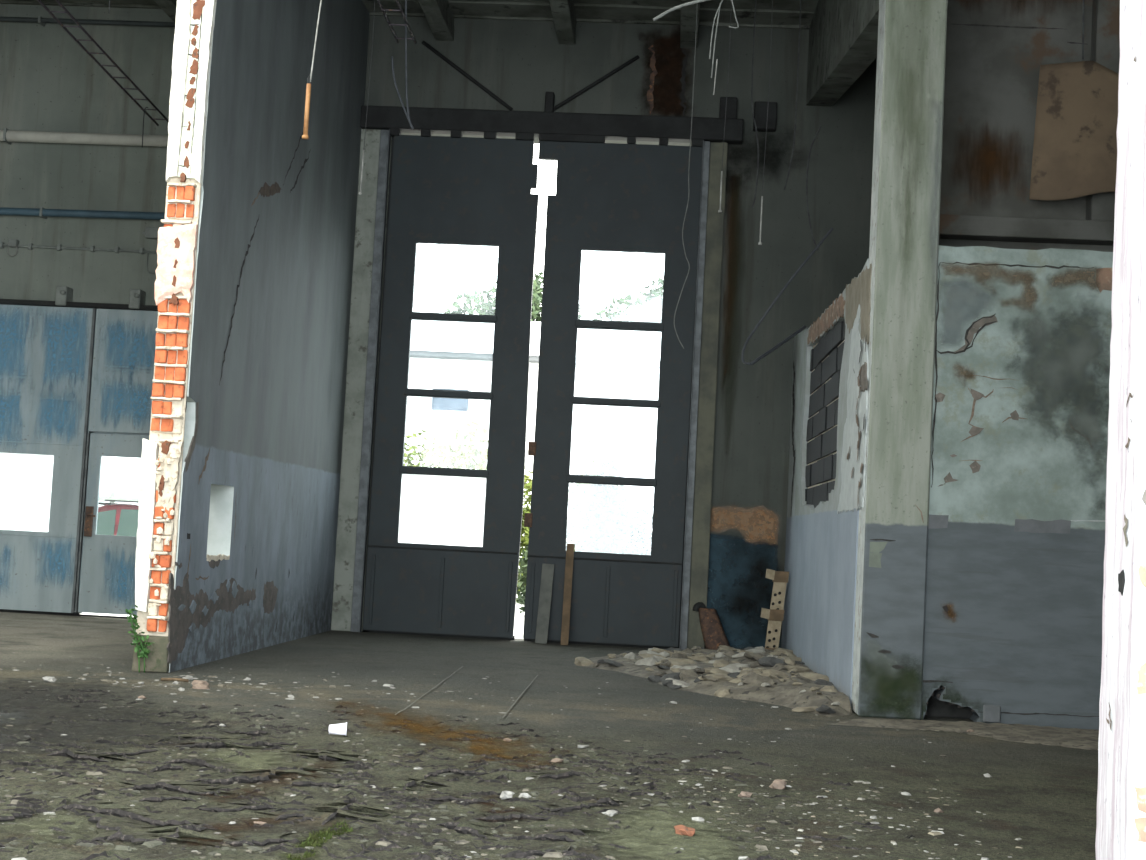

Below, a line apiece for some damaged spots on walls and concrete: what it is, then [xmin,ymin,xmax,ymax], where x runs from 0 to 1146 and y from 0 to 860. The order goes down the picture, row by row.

crack [283,133,310,192]
crack [219,218,259,385]
flaking render [1096,268,1113,293]
flaking render [102,183,278,664]
peeling [807,264,872,514]
peeling [1118,563,1146,596]